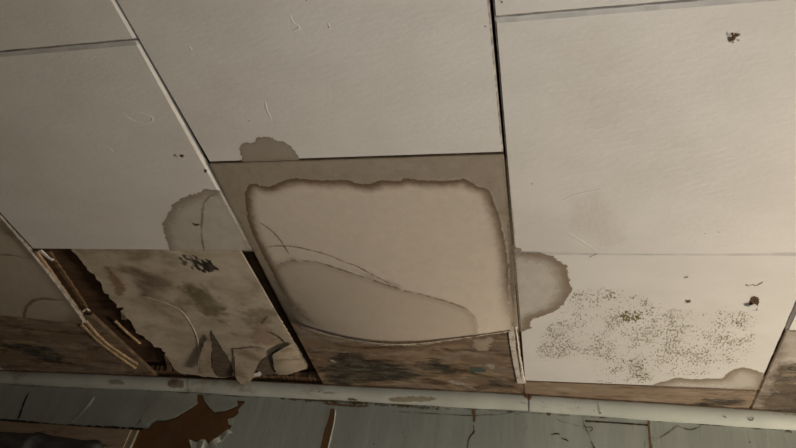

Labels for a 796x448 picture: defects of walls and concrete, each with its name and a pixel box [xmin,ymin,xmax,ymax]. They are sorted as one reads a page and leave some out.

water stain [0,218,155,376]
water stain [162,137,796,412]
peeling [132,393,245,448]